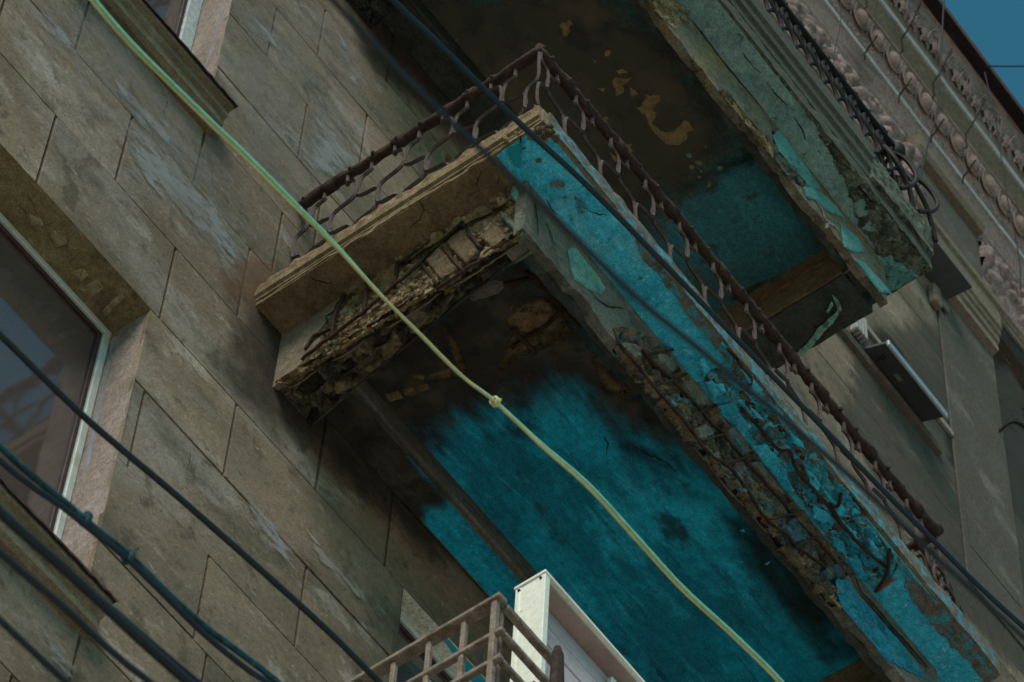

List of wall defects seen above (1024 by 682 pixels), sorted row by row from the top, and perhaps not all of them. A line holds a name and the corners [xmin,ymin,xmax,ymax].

spalling [275,186,582,414]
peeling [568,248,605,294]
peeling [598,69,711,187]
spalling [719,89,930,294]
spalling [593,239,1001,682]